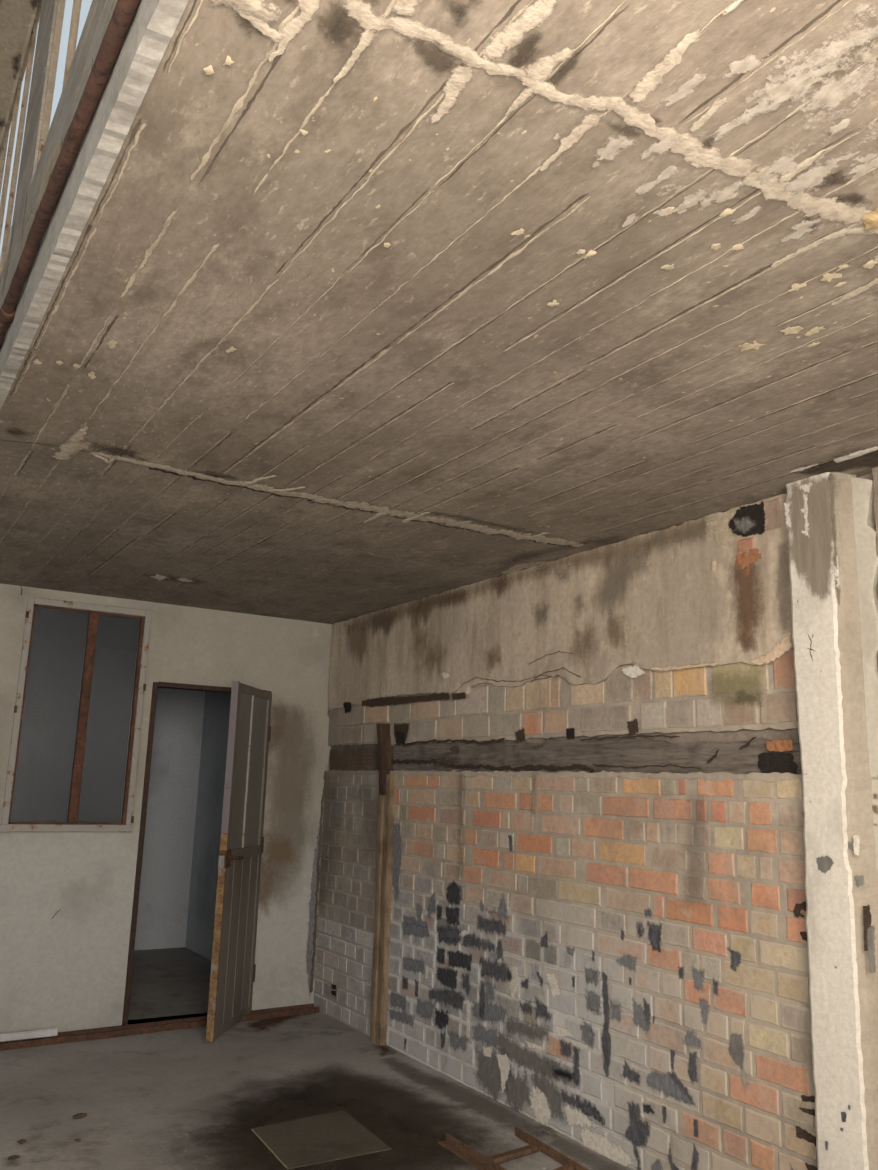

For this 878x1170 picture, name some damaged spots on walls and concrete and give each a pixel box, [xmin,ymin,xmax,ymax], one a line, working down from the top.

leakage [319,4,359,42]
leakage [416,40,459,72]
leakage [510,35,539,66]
peeling [592,3,878,224]
crack [221,0,878,269]
crack [831,278,878,306]
crack [2,426,584,548]
spalling [706,501,766,577]
leakage [348,523,705,657]
spalling [793,902,807,918]
spalling [799,1095,815,1116]
spalling [796,1125,828,1150]